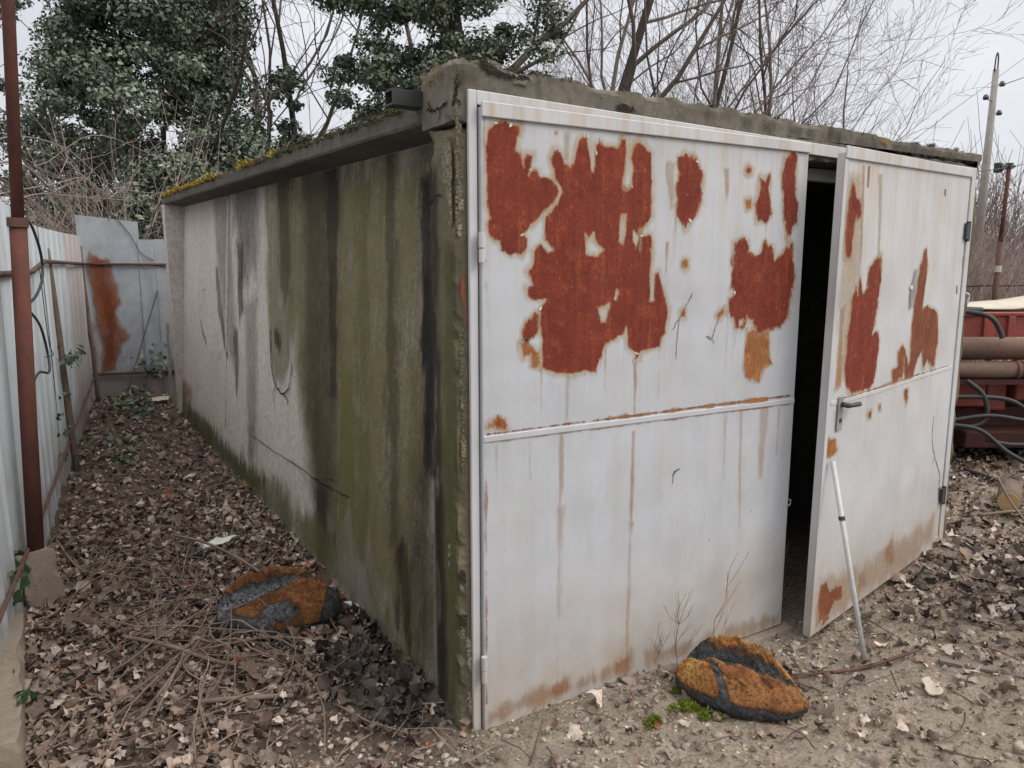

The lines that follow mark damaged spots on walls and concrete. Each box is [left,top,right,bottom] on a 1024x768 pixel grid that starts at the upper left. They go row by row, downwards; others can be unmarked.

corrosion [87,252,129,371]
leakage [188,408,260,488]
leakage [203,188,256,422]
crack [270,332,292,404]
leakage [278,180,289,298]
crack [252,436,350,498]
leakage [307,168,354,536]
leakage [391,172,447,699]
corrosion [485,120,668,381]
corrosion [716,152,803,383]
corrosion [845,166,871,260]
corrosion [836,248,949,404]